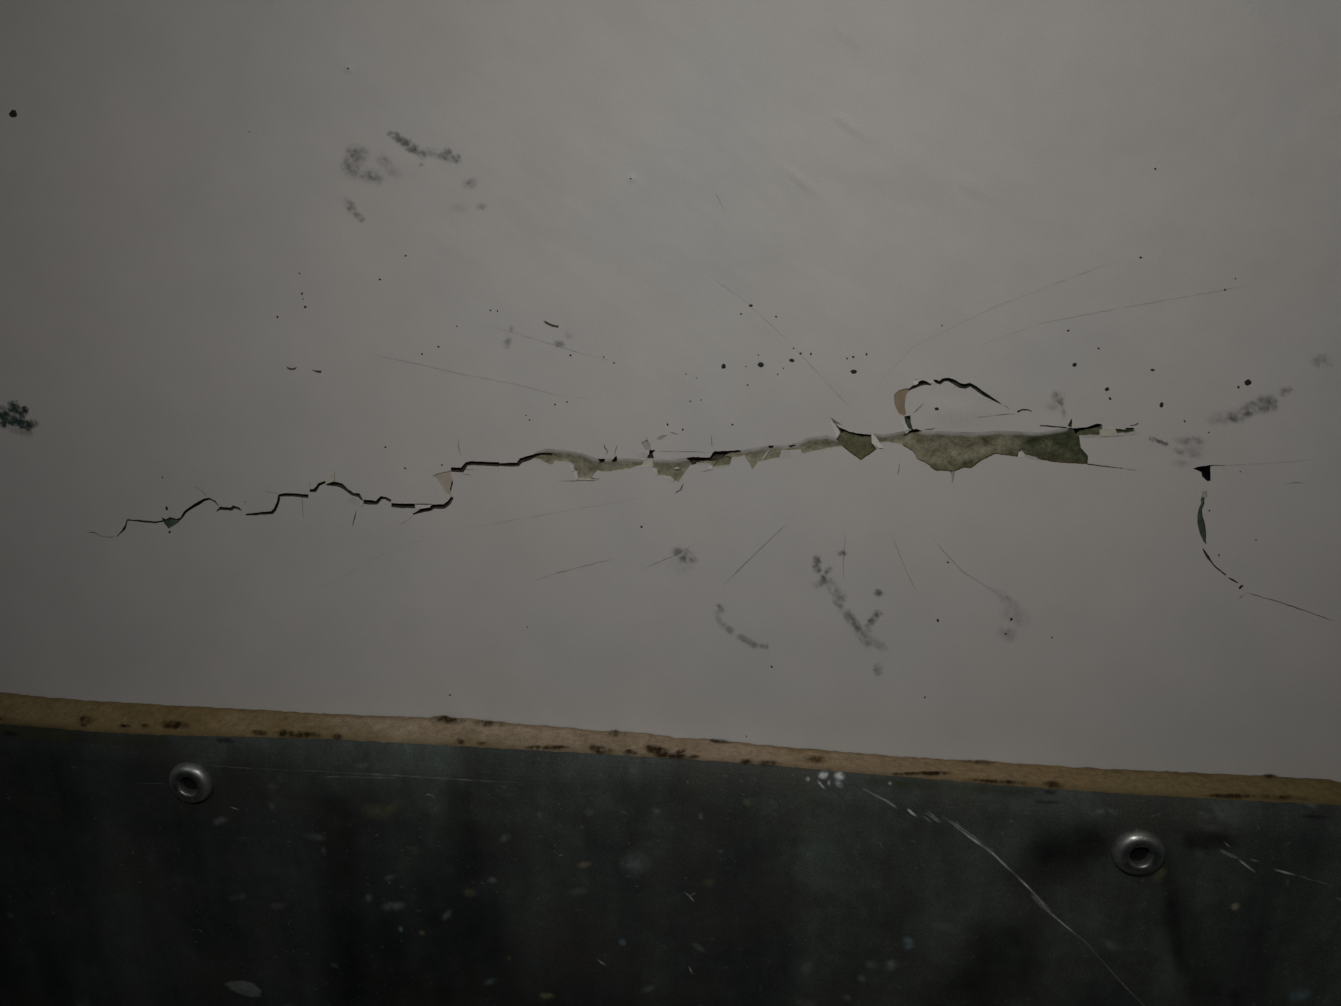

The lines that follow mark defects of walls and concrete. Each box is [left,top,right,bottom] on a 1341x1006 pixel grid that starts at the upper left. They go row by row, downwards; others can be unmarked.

damp [0,402,32,431]
crack [894,378,1138,437]
crack [90,446,543,537]
spalling [535,417,1123,493]
crack [1197,491,1325,618]